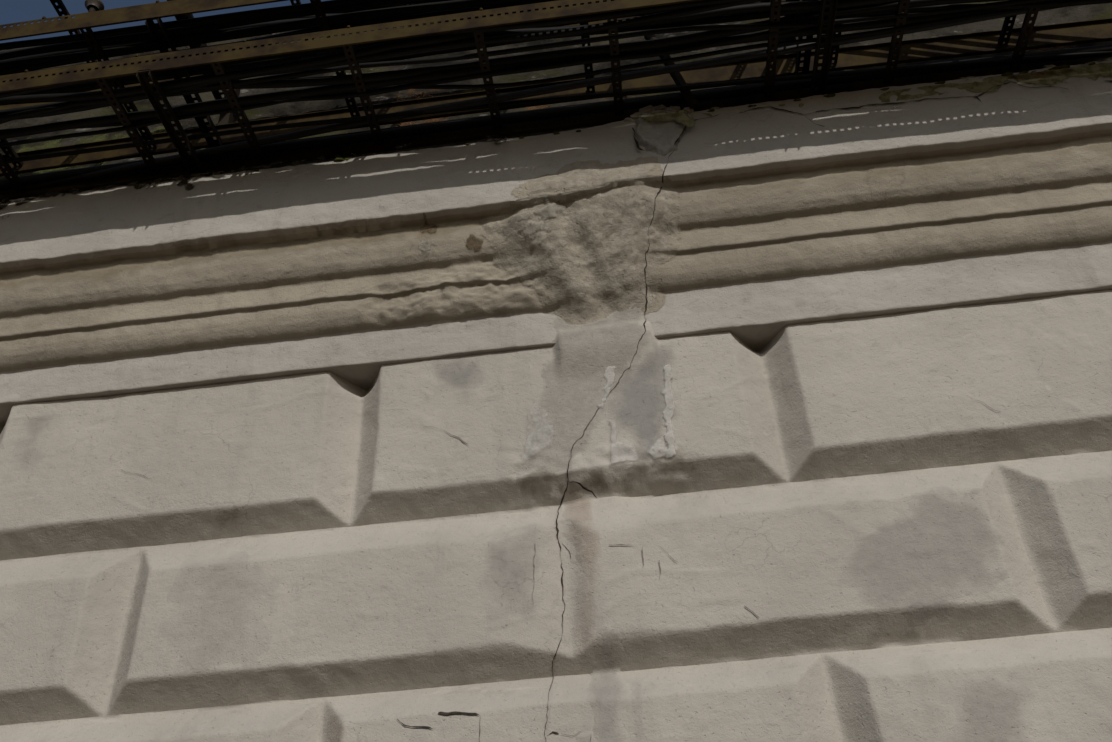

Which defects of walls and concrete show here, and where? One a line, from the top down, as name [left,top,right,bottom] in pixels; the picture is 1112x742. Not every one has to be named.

peeling [623,105,694,156]
crack [532,81,1069,742]